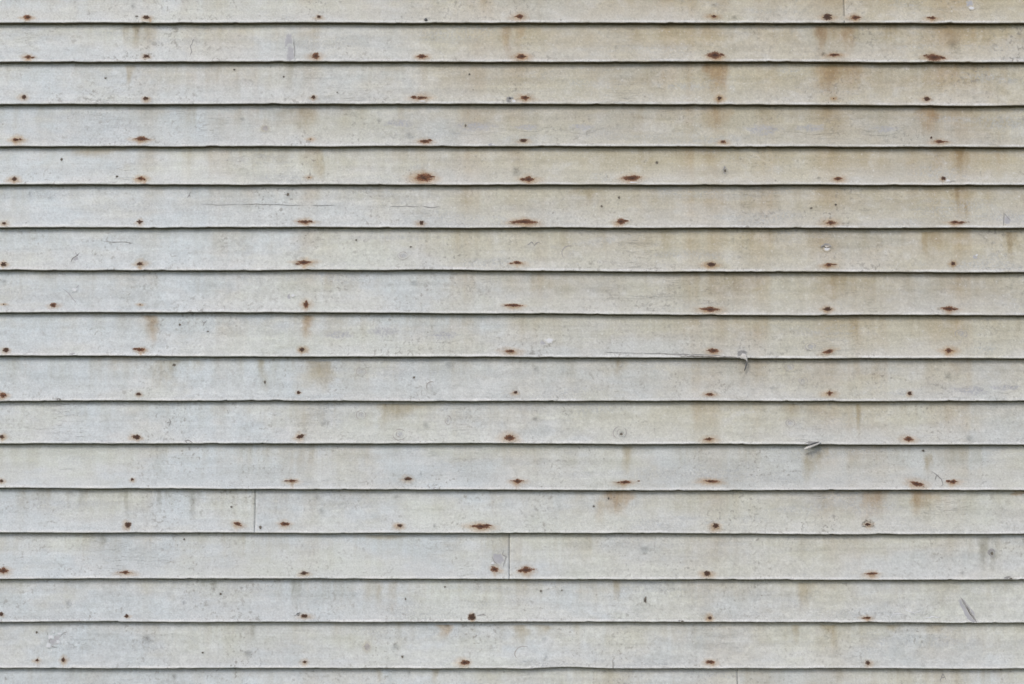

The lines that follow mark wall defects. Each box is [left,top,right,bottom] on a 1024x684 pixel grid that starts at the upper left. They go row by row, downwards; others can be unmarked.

rust [810,11,875,102]
rust [915,50,954,62]
rust [699,50,737,146]
rust [124,134,158,146]
rust [400,167,445,184]
rust [612,171,650,184]
rust [499,215,548,227]
rust [285,255,324,269]
rust [690,305,732,315]
rust [856,475,967,531]
rust [456,520,503,533]
rust [486,562,541,579]